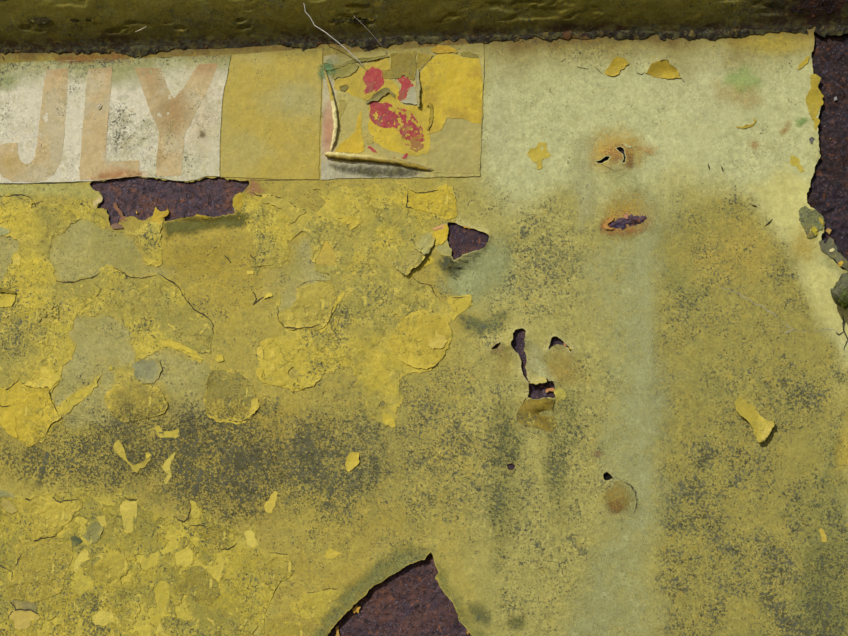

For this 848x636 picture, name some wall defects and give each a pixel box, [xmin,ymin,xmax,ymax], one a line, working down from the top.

corrosion [46,45,187,62]
corrosion [277,25,848,270]
corrosion [91,174,260,229]
crack [57,268,214,334]
peeling [0,182,473,447]
peeling [530,374,547,384]
peeling [516,388,567,431]
peeling [113,440,152,473]
peeling [163,452,175,484]
peeling [345,452,360,472]
peeling [0,490,342,636]
corrosion [328,553,472,636]